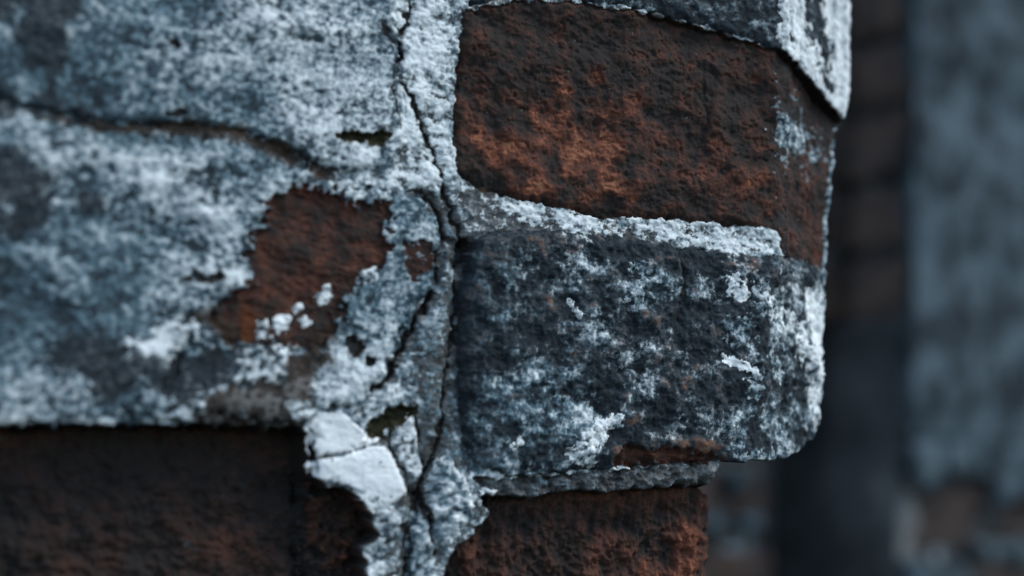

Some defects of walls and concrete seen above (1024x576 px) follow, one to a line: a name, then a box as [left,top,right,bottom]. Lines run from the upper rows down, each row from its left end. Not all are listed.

leakage [0,0,104,120]
leakage [0,143,58,241]
leakage [76,193,107,216]
spalling [123,182,436,384]
crack [354,0,468,576]
leakage [44,304,337,432]
leakage [447,251,476,471]